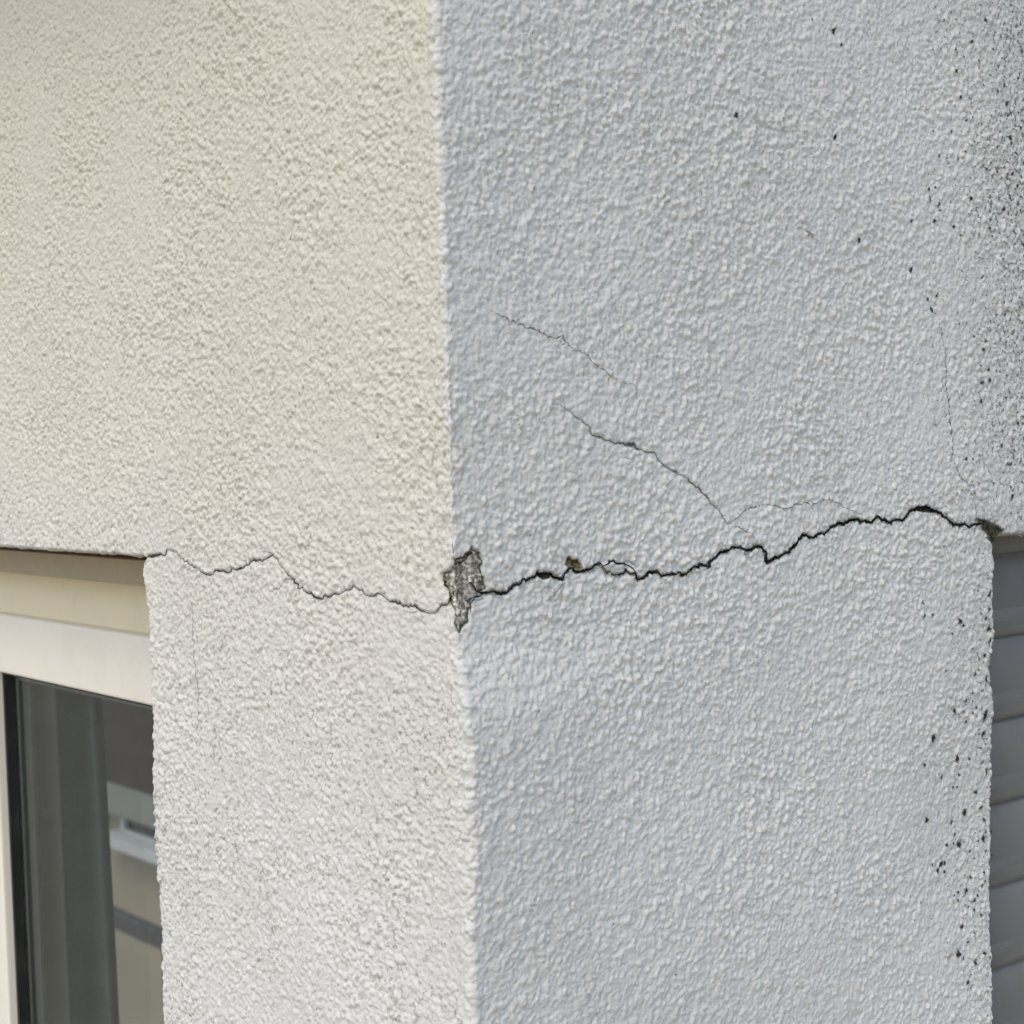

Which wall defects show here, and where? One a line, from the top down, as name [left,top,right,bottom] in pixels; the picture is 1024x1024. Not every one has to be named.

crack [492,311,633,385]
crack [148,327,981,614]
spalling [443,547,486,632]